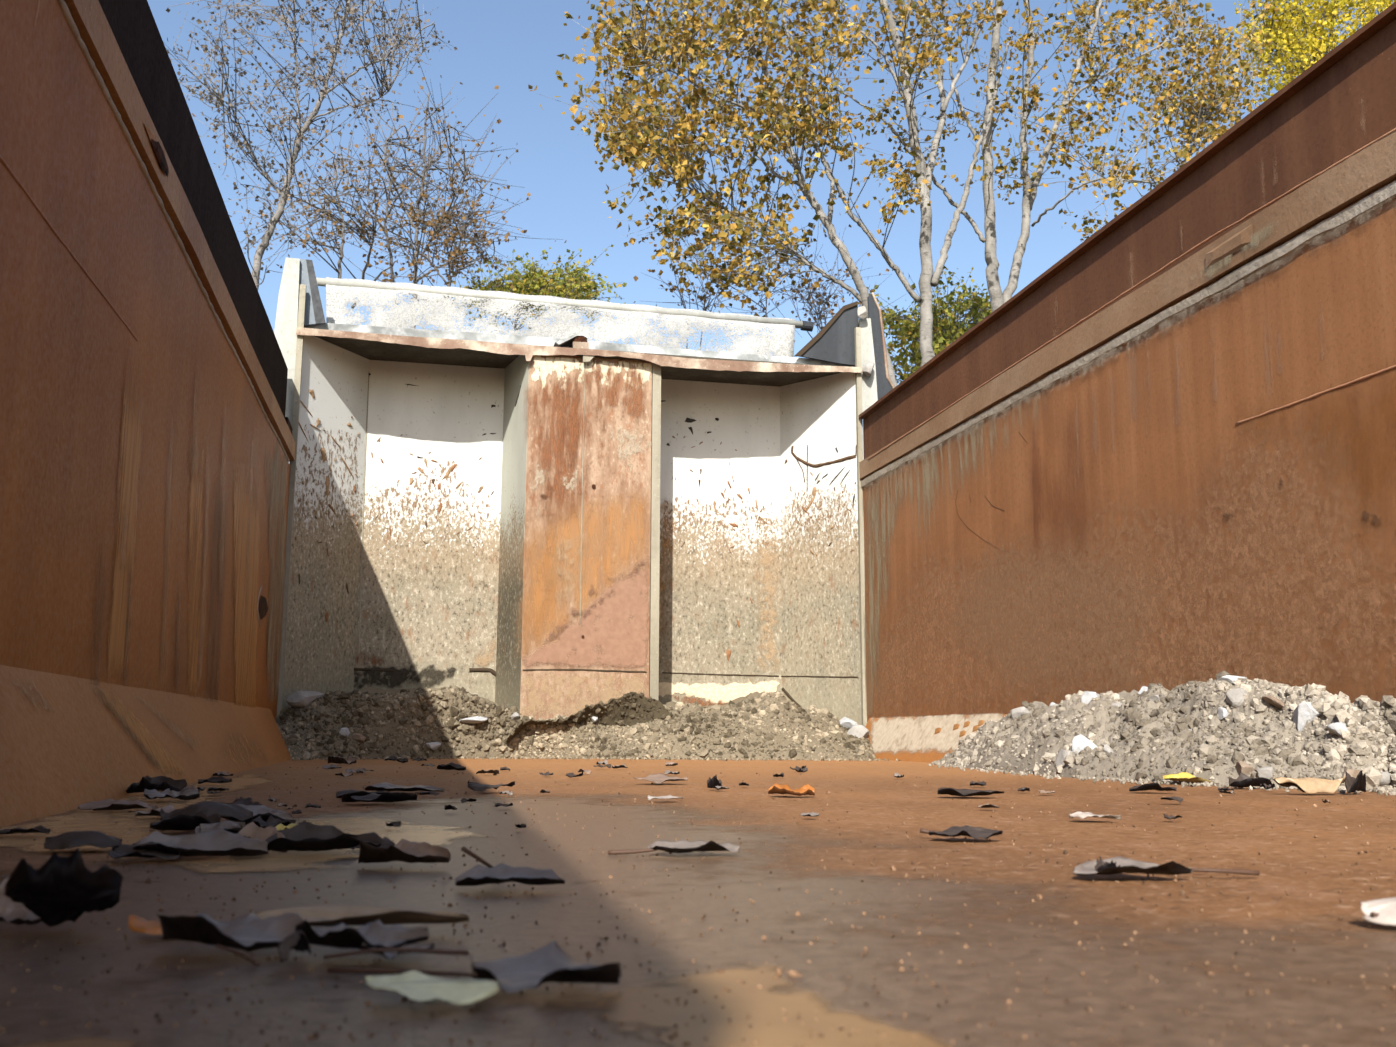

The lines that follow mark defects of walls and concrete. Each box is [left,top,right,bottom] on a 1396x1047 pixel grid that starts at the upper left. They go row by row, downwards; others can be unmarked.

corrosion [108,384,141,673]
corrosion [529,368,644,507]